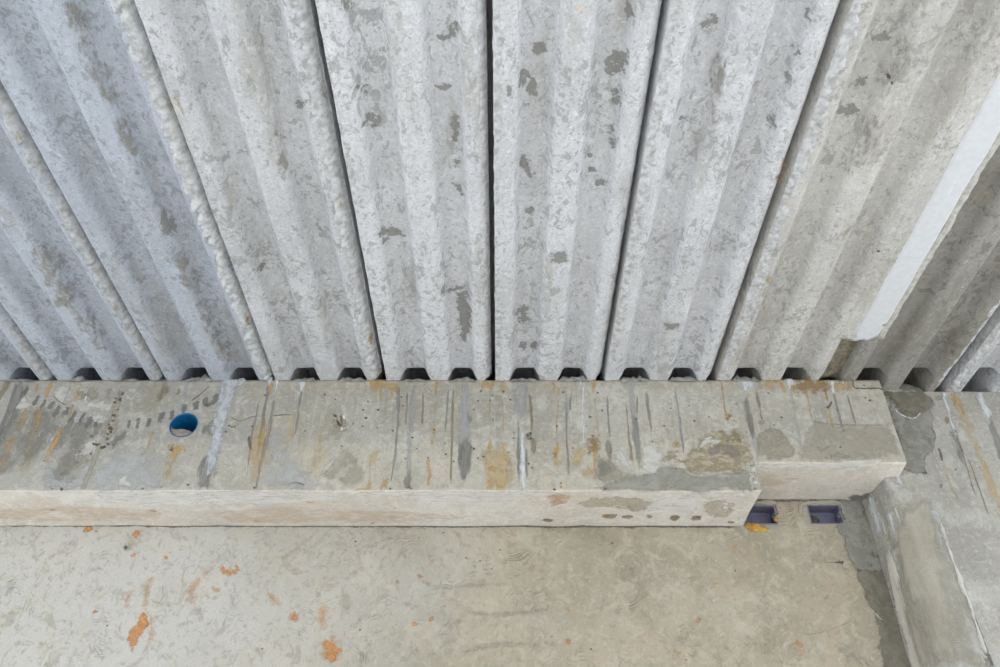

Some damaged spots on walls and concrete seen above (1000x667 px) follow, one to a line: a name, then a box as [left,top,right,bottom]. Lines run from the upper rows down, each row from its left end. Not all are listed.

water stain [199,378,245,488]
water stain [445,386,472,480]
water stain [516,385,533,489]
rust [768,380,848,419]